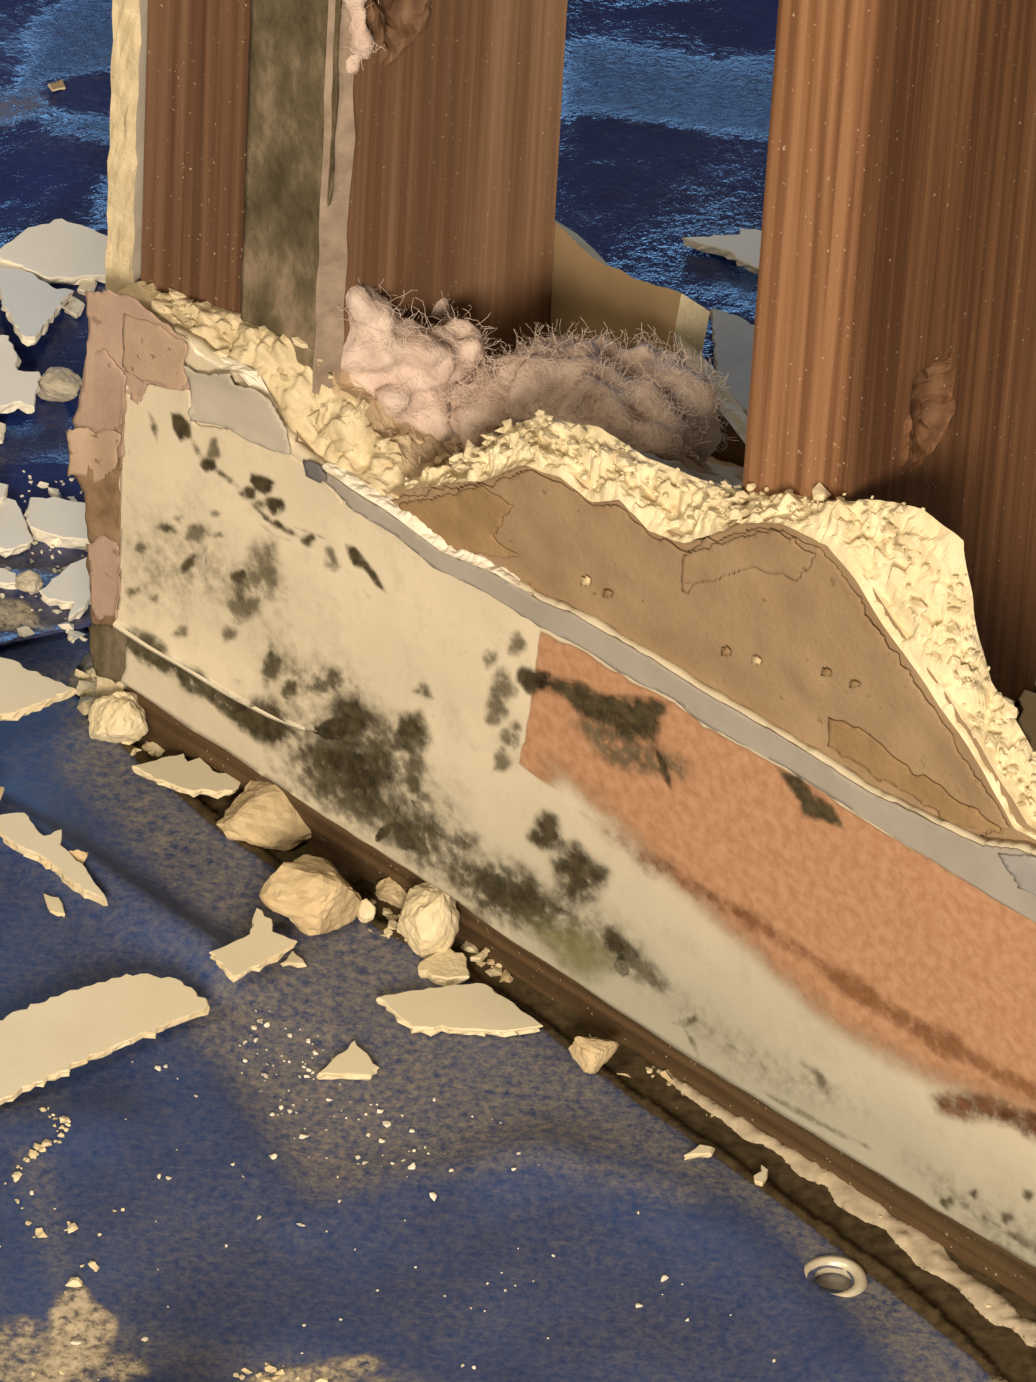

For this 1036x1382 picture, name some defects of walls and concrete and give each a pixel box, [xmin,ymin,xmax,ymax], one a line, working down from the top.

damp [223,546,276,639]
damp [151,414,383,589]
peeling [137,281,1036,922]
damp [126,628,665,989]
damp [485,632,1036,1116]